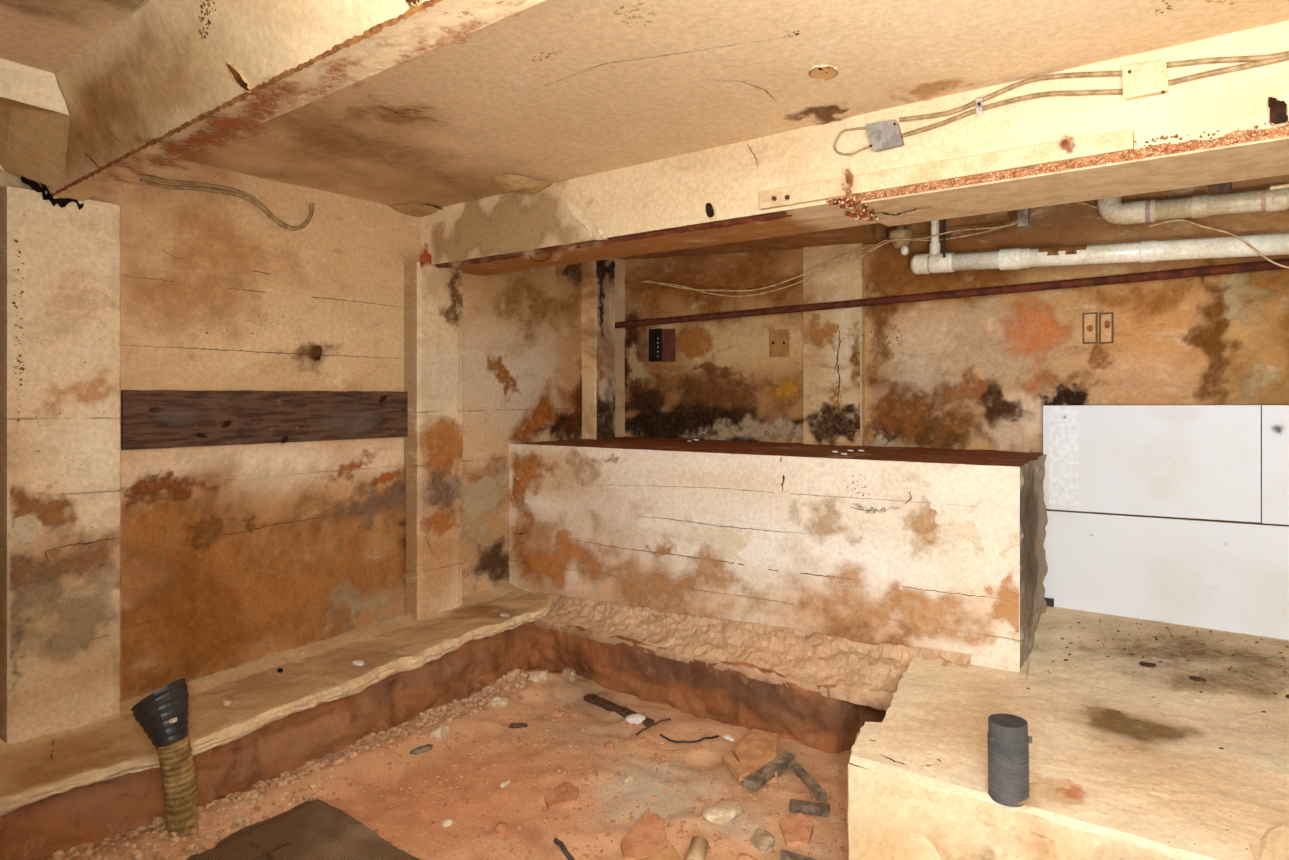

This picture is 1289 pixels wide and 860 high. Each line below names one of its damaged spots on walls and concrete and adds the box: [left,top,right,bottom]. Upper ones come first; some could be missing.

corrosion [51,0,481,197]
spalling [1134,97,1289,146]
spalling [829,196,878,222]
damp [297,345,322,362]
damp [1089,343,1111,368]
damp [505,237,1088,645]
damp [10,419,745,691]
damp [1118,638,1286,695]
damp [1089,708,1195,751]